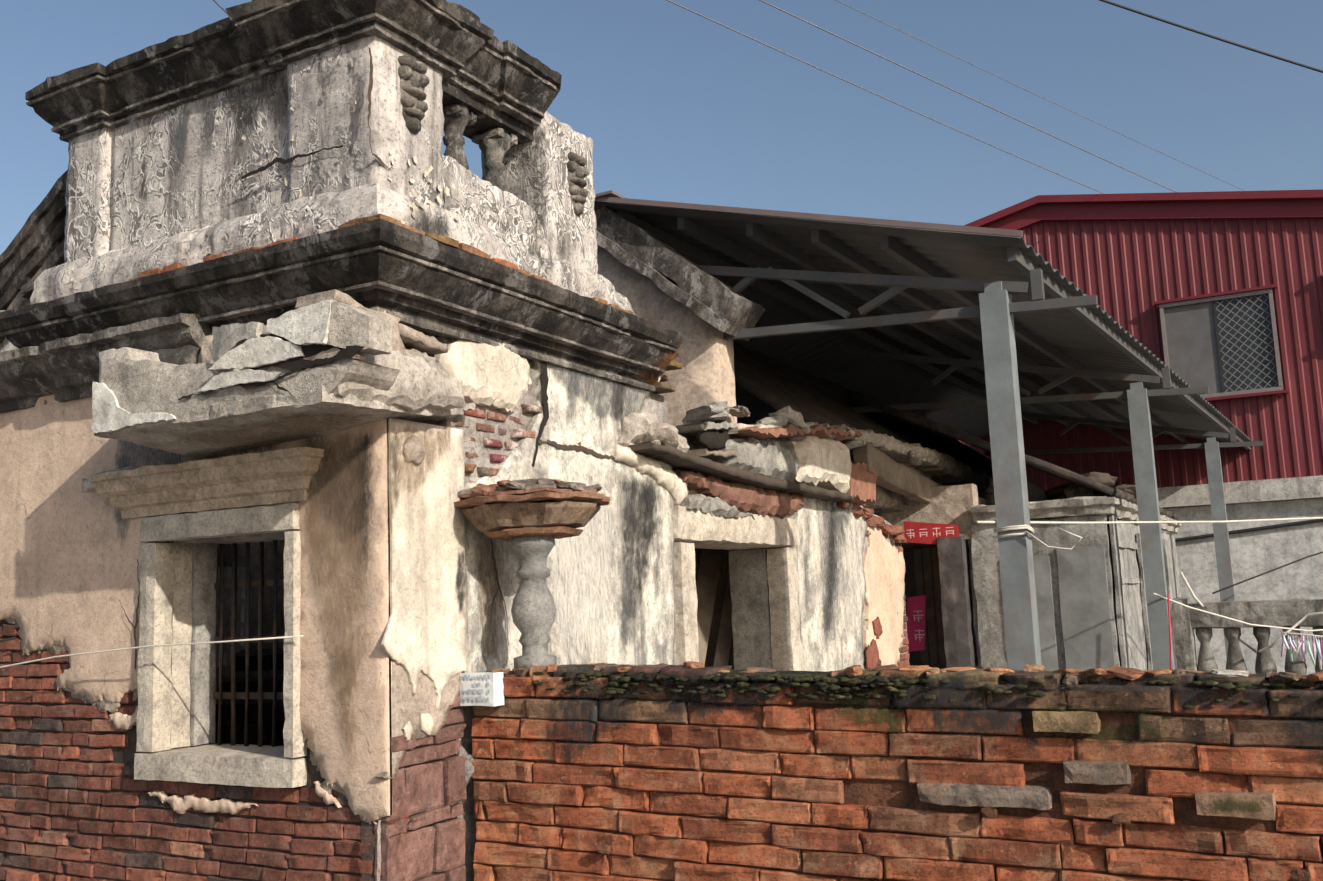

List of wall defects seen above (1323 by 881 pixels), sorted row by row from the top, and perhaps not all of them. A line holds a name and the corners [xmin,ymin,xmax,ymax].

damp [171,68,288,170]
crack [241,47,394,179]
peeling [91,382,176,433]
spalling [178,299,392,400]
crack [532,361,626,466]
damp [115,416,372,753]
peeling [381,404,542,740]
damp [806,502,862,640]
peeling [836,501,910,669]
peeling [0,620,409,881]